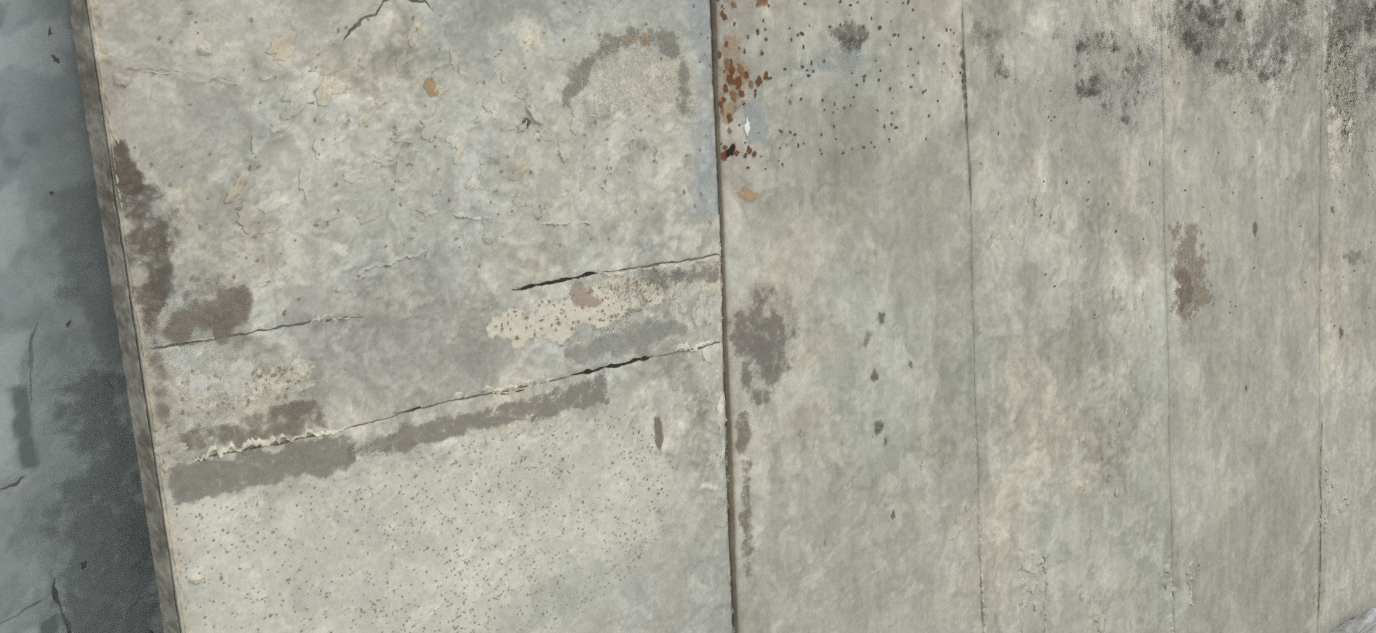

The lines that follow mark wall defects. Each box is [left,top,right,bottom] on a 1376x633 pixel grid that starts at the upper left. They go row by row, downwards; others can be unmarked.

corrosion [685,0,964,170]
leakage [1076,74,1106,105]
leakage [1179,0,1242,56]
leakage [1215,39,1294,81]
leakage [1325,5,1376,182]
corrosion [495,276,669,340]
crack [512,253,721,290]
leakage [1170,221,1213,329]
crack [193,340,721,463]
leakage [168,263,796,505]